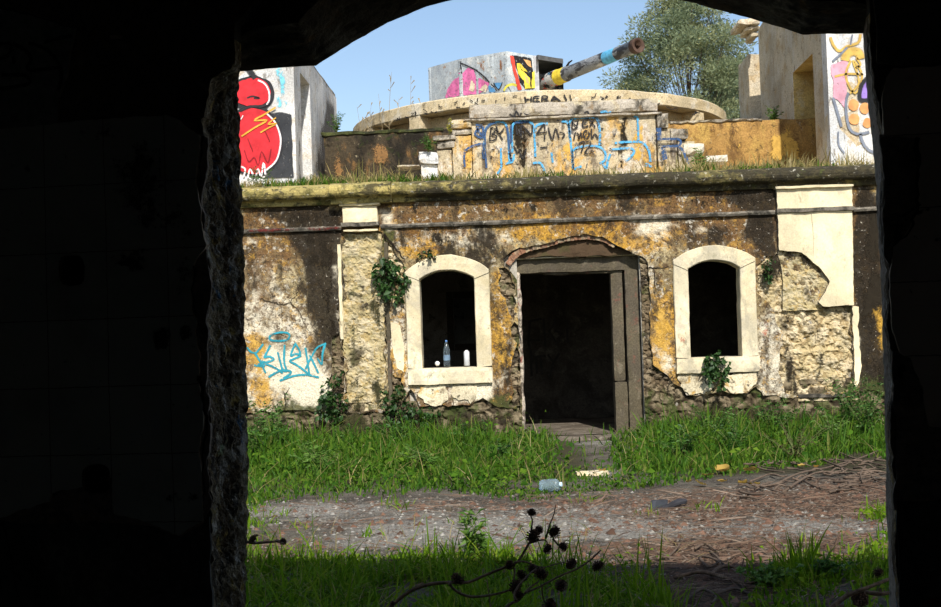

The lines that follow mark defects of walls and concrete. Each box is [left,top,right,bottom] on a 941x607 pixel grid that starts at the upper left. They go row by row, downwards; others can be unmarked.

damp [250,335,267,389]
damp [289,210,339,338]
damp [432,233,454,246]
damp [656,303,670,362]
spalling [757,247,858,401]
damp [855,194,883,333]